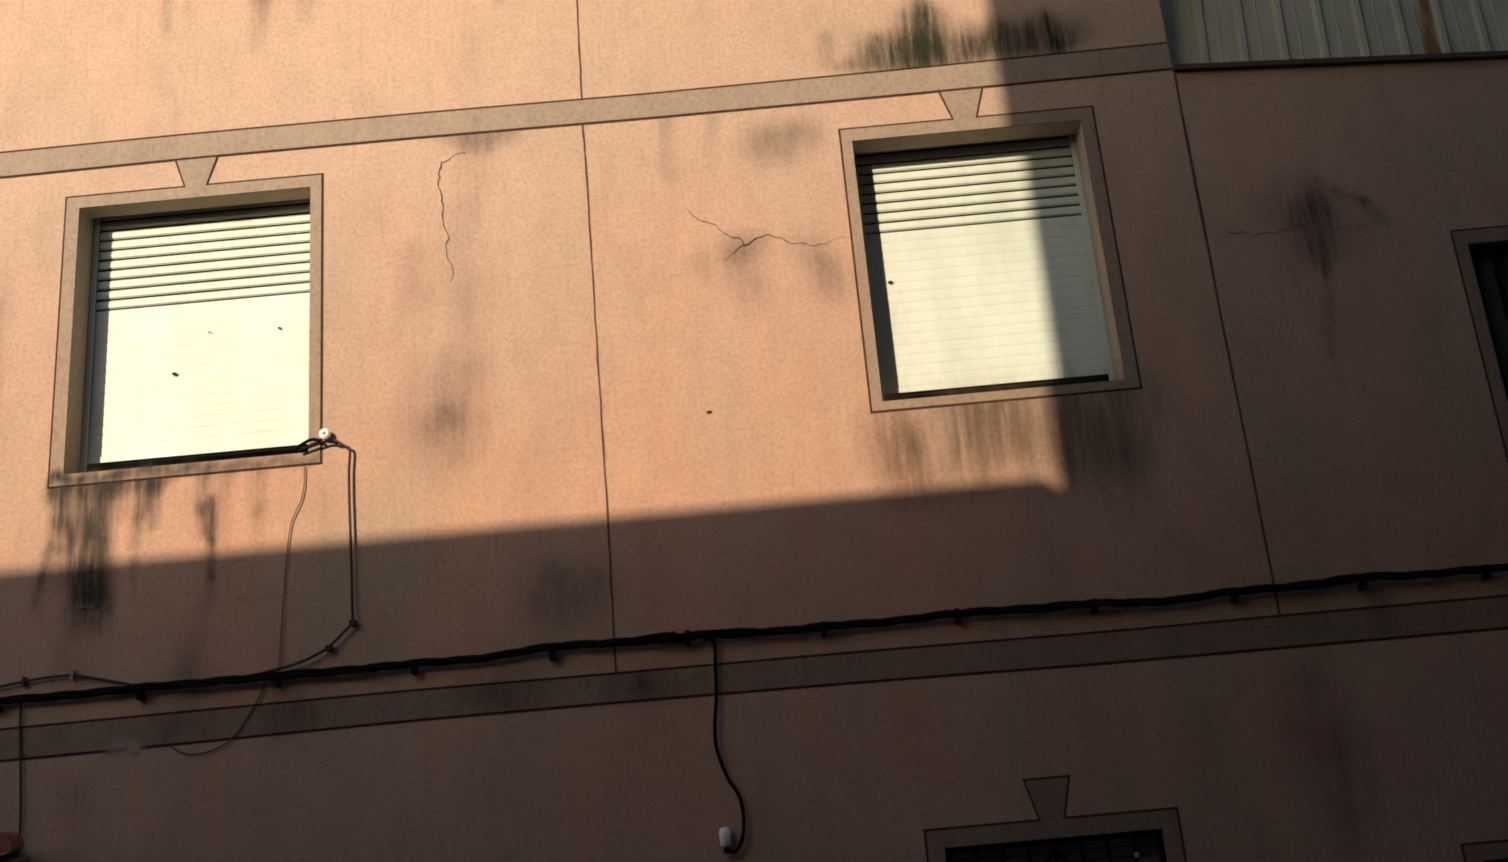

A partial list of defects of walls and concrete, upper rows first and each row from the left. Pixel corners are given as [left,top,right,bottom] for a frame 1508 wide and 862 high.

water stain [868,7,1074,70]
corrosion [1420,0,1440,54]
crack [437,152,466,282]
crack [689,211,839,260]
water stain [49,466,160,622]
water stain [200,498,214,547]